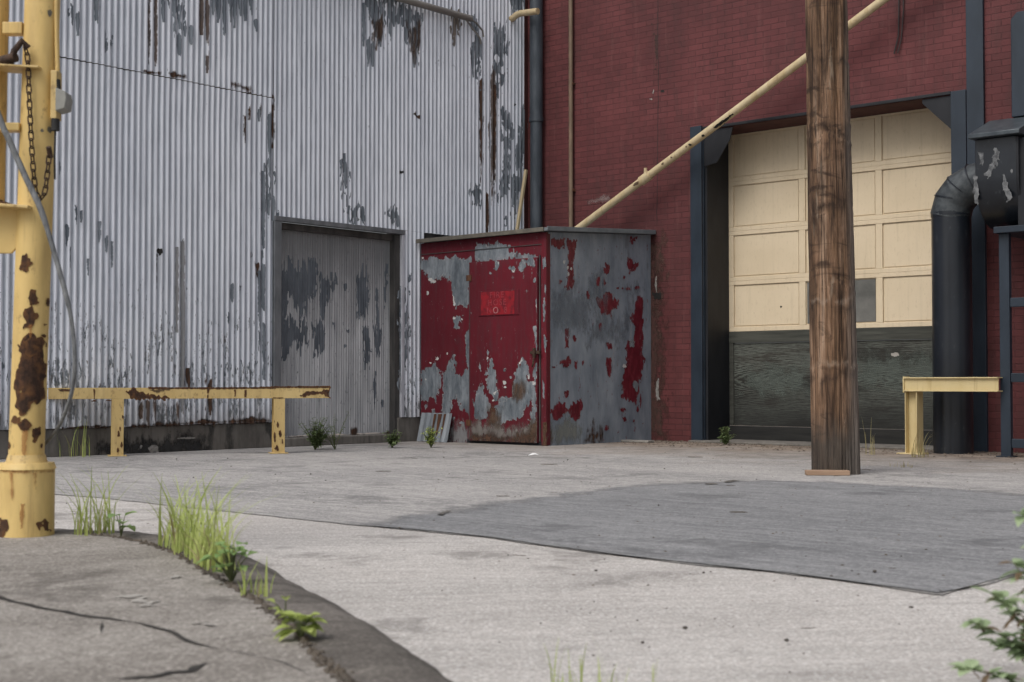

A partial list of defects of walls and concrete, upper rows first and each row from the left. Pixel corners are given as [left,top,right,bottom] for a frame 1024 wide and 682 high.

rust [144,0,186,78]
rust [199,0,210,73]
peeling [362,0,424,68]
rust [231,83,275,148]
peeling [450,0,525,226]
peeling [972,148,1013,205]
rust [8,289,50,455]
rust [62,368,331,452]
peeling [281,238,584,446]
spalling [586,230,669,441]
rust [0,470,36,537]
crack [0,596,306,680]